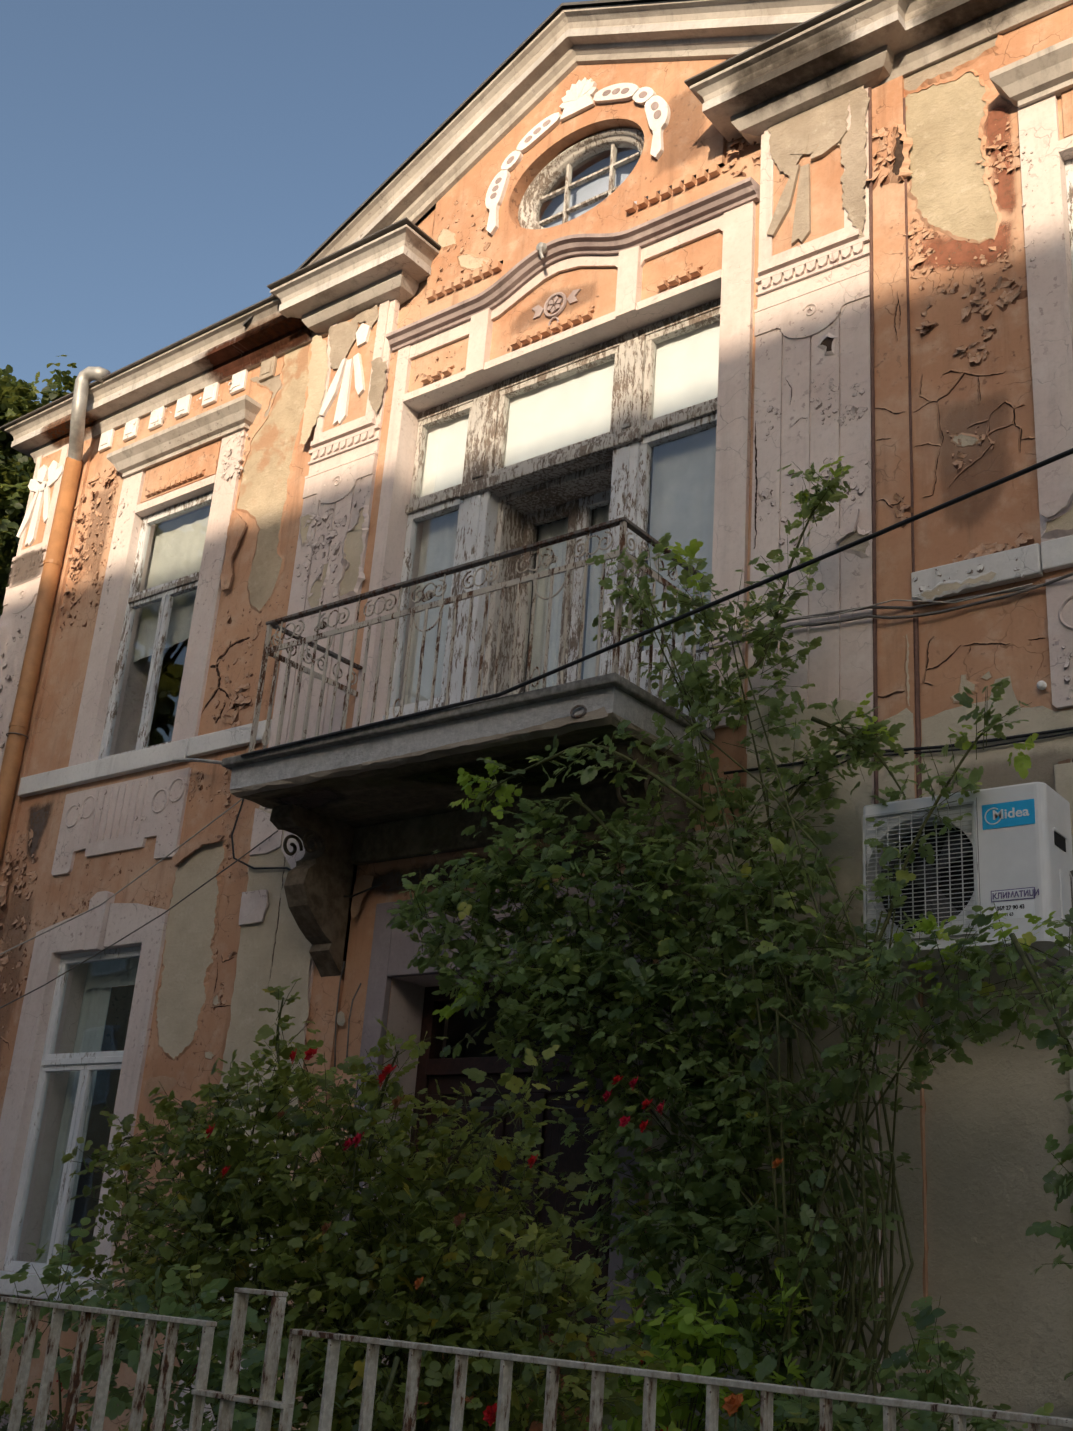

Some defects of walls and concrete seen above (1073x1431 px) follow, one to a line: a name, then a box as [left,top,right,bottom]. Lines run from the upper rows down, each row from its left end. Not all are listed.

peeling [722,34,1036,367]
peeling [59,466,128,638]
crack [201,635,251,723]
peeling [124,305,378,728]
crack [875,369,1035,508]
peeling [130,808,312,1154]